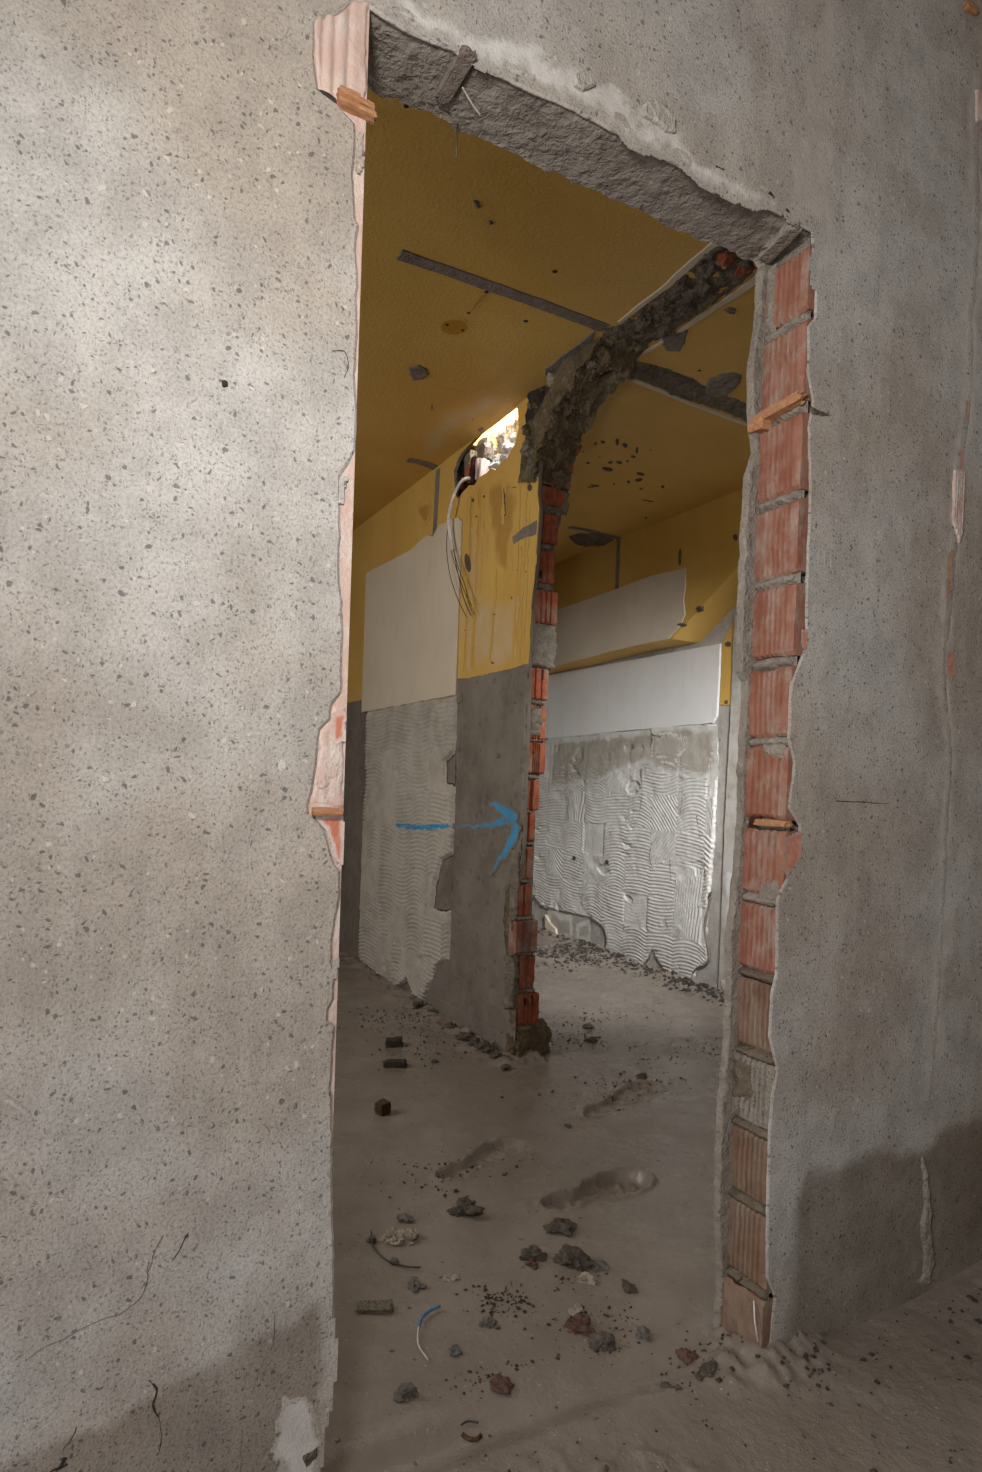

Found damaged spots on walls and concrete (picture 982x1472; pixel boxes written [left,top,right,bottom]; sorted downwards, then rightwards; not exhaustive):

peeling [662,329,688,352]
water stain [771,1108,982,1343]
spalling [303,1446,318,1467]